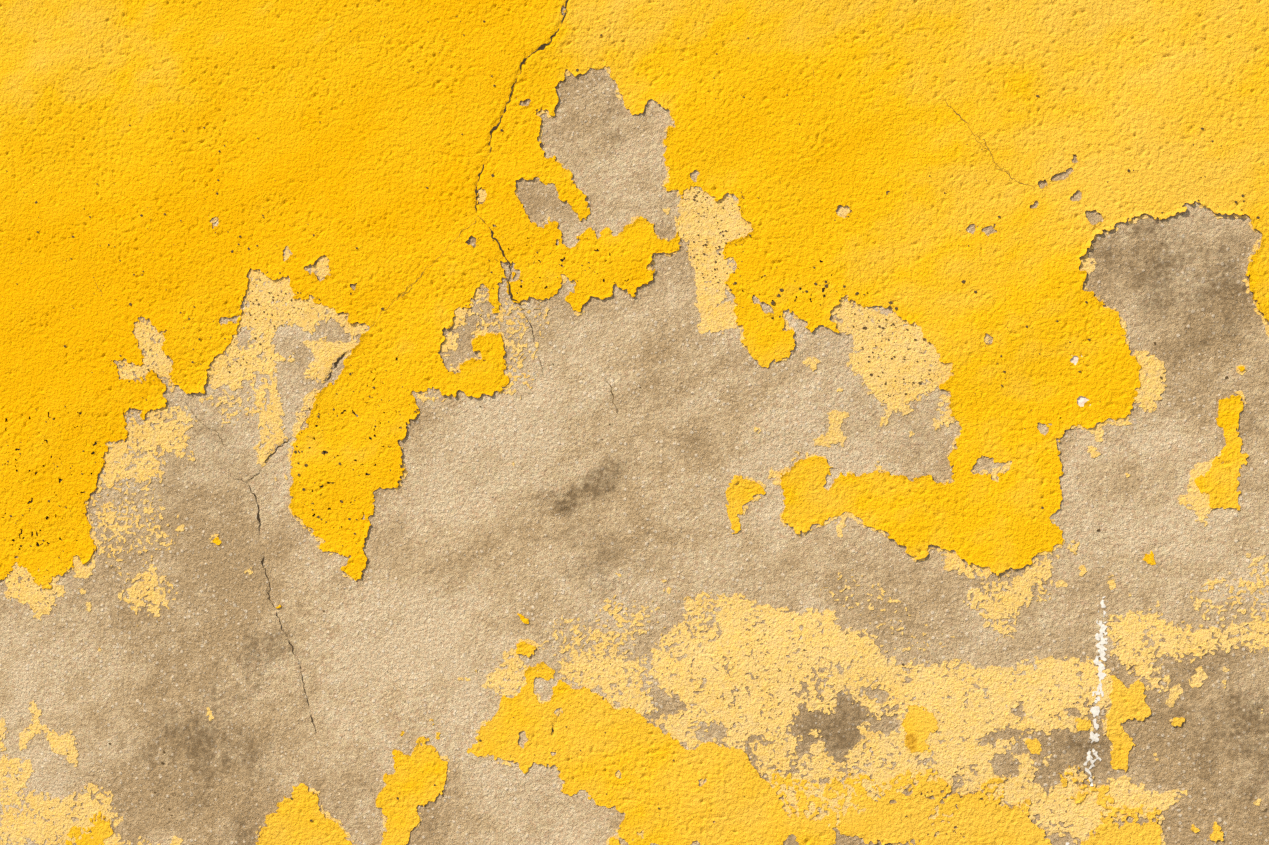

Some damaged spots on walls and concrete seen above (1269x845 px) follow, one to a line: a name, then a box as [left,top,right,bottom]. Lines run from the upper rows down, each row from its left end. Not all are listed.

crack [370,0,568,378]
spalling [1030,155,1078,208]
spalling [836,205,852,218]
spalling [966,224,997,236]
spalling [1085,210,1103,225]
spalling [283,246,331,281]
spalling [752,294,774,318]
spalling [970,456,1012,482]
crack [183,401,316,733]
peeling [1096,669,1113,709]
peeling [1070,791,1091,804]
peeling [1105,775,1188,819]